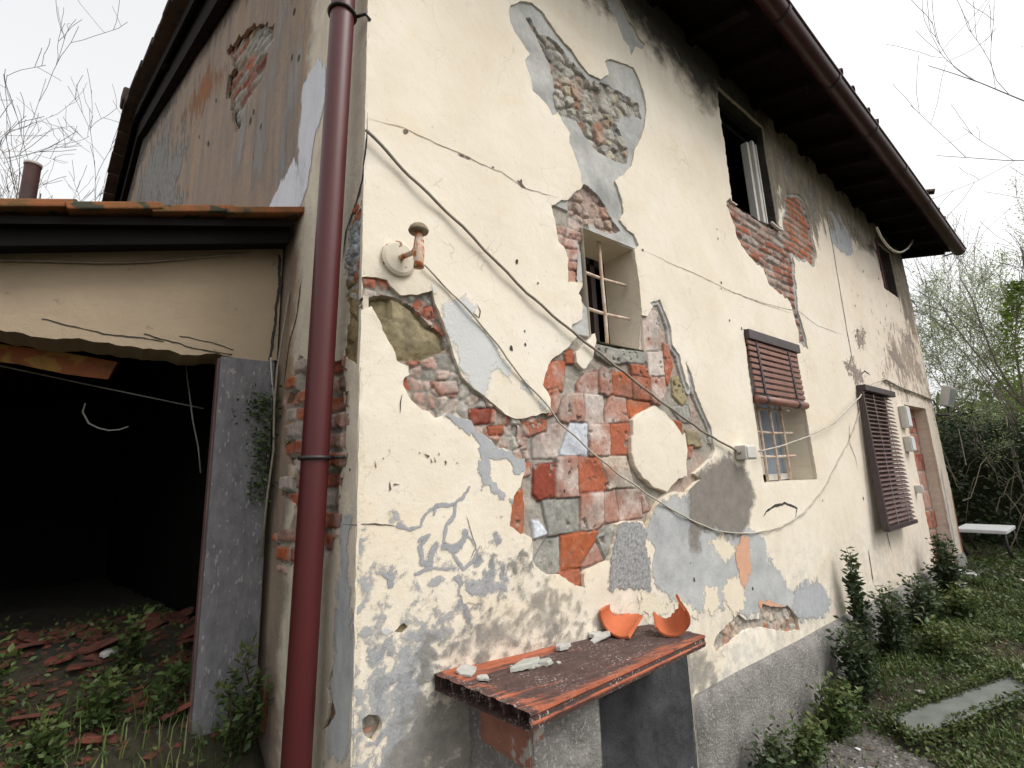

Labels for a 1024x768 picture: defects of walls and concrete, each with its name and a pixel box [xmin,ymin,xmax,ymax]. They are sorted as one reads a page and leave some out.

flaking render [230,26,275,130]
crack [342,112,559,260]
flaking render [509,0,645,283]
water stain [620,0,935,413]
crack [42,318,233,355]
crack [642,220,870,375]
flaking render [272,528,296,573]
flaking render [279,358,307,506]
flaking render [323,194,831,768]
crack [763,502,797,517]
water stain [352,528,606,768]
water stain [687,650,718,768]